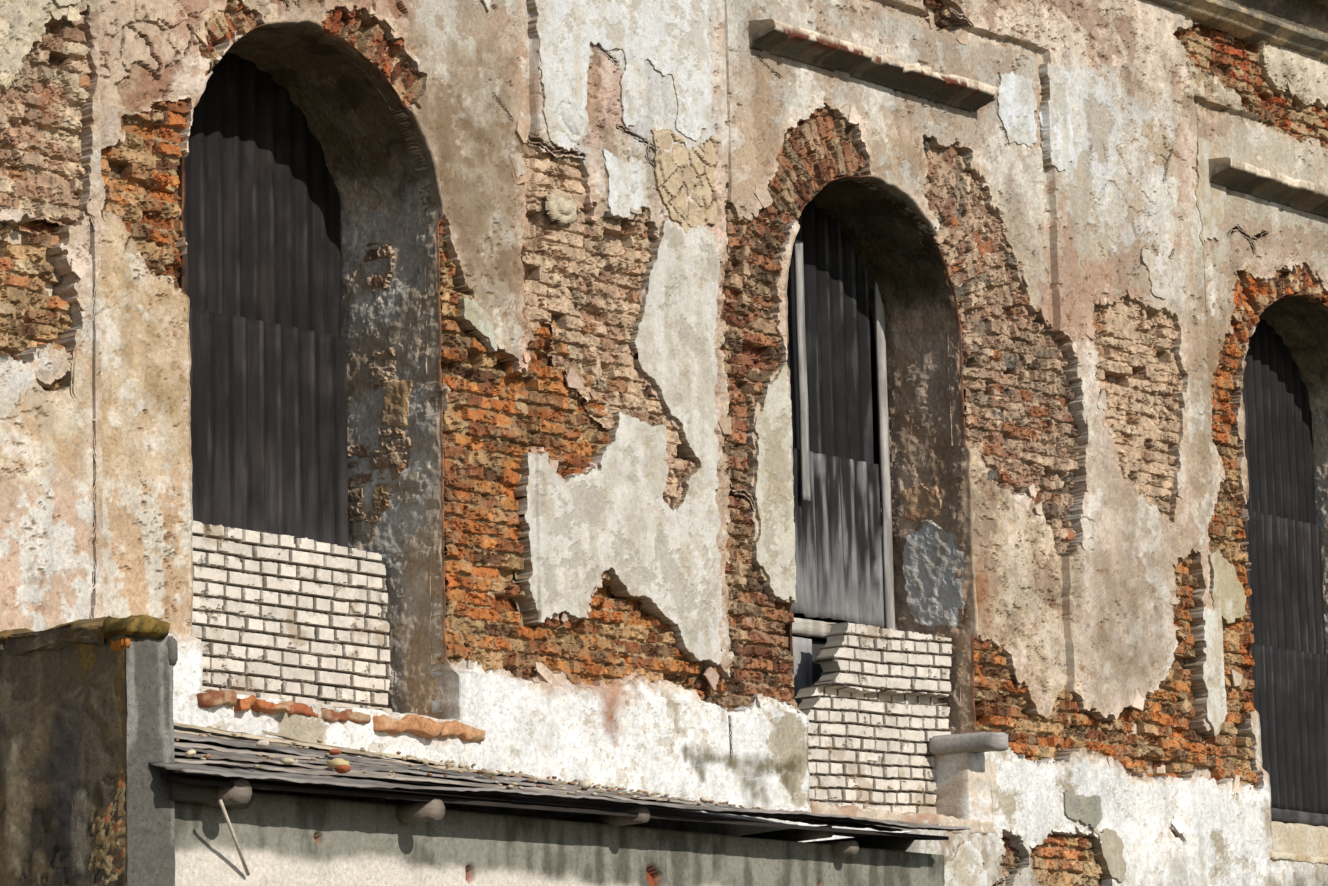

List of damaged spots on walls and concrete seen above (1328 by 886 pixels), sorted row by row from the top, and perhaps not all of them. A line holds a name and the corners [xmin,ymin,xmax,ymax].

spalling [192,0,257,76]
spalling [322,6,423,106]
spalling [1173,24,1328,149]
spalling [0,0,189,360]
spalling [363,243,396,293]
peeling [430,0,867,719]
spalling [923,138,1184,555]
spalling [348,347,413,524]
peeling [902,483,965,628]
spalling [963,264,1328,795]
spalling [944,789,1127,886]